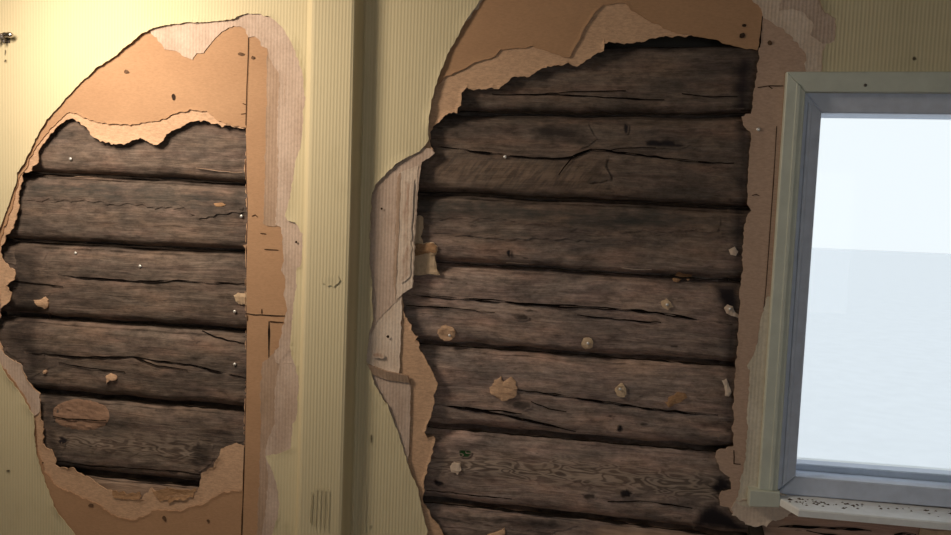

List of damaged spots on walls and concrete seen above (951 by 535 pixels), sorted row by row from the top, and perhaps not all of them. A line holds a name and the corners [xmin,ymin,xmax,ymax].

crack [432,146,734,175]
crack [15,274,245,287]
crack [25,352,244,378]